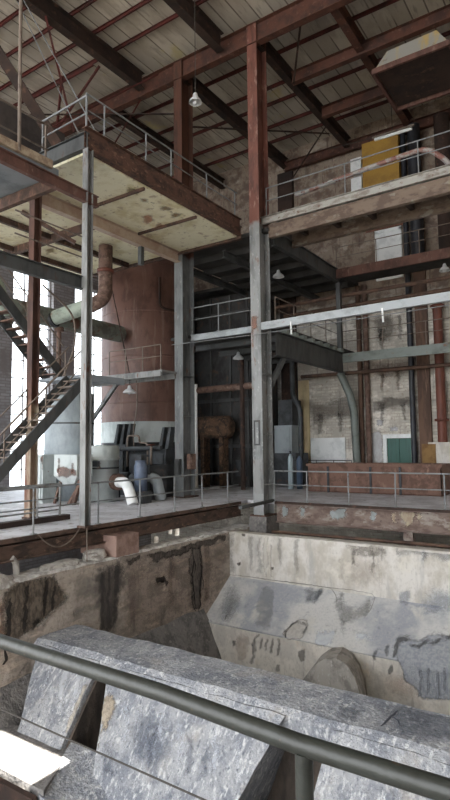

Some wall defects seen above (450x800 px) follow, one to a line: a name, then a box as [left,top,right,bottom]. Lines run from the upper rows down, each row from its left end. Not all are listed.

peeling [330,509,345,519]
peeling [392,512,421,525]
damp [97,565,123,632]
peeling [283,619,307,640]
peeling [393,634,450,700]